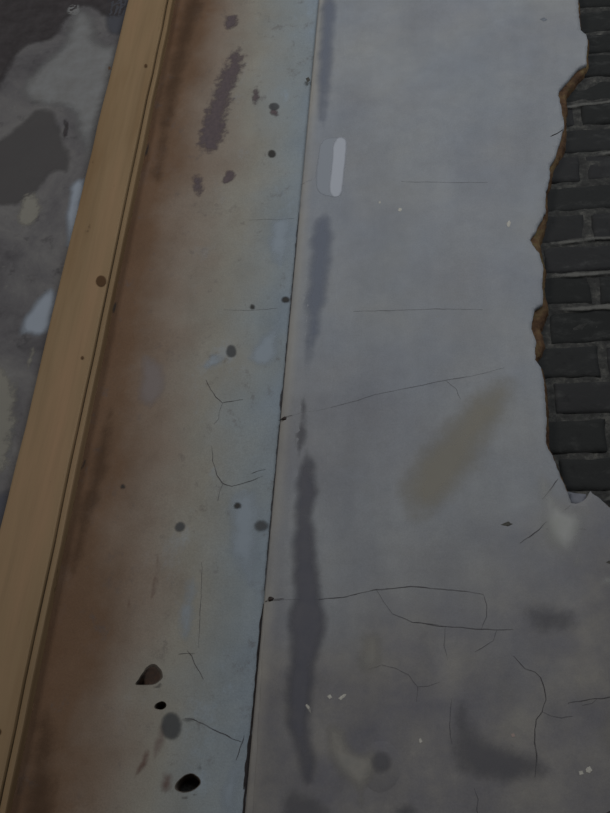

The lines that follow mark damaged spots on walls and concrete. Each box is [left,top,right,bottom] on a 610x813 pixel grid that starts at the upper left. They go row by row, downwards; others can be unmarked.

crack [187,213,299,813]
peeling [568,492,586,504]
damp [289,462,323,778]
crack [319,586,511,652]
crack [517,660,610,774]